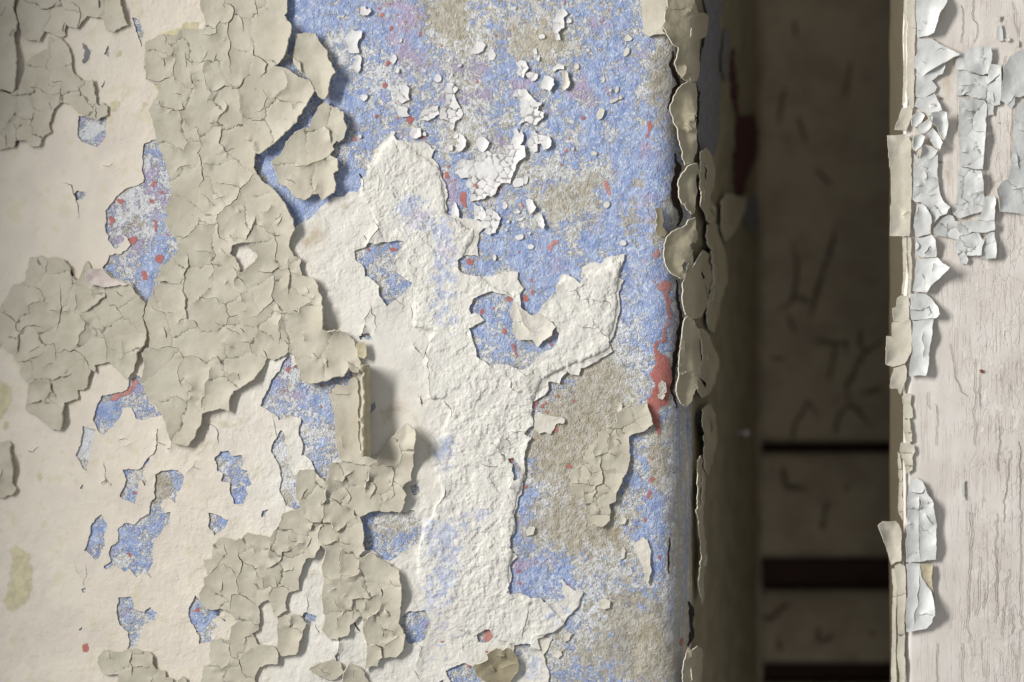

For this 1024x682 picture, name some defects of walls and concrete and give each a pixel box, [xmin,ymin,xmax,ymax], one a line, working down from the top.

spalling [0,0,747,682]
peeling [878,0,1024,682]